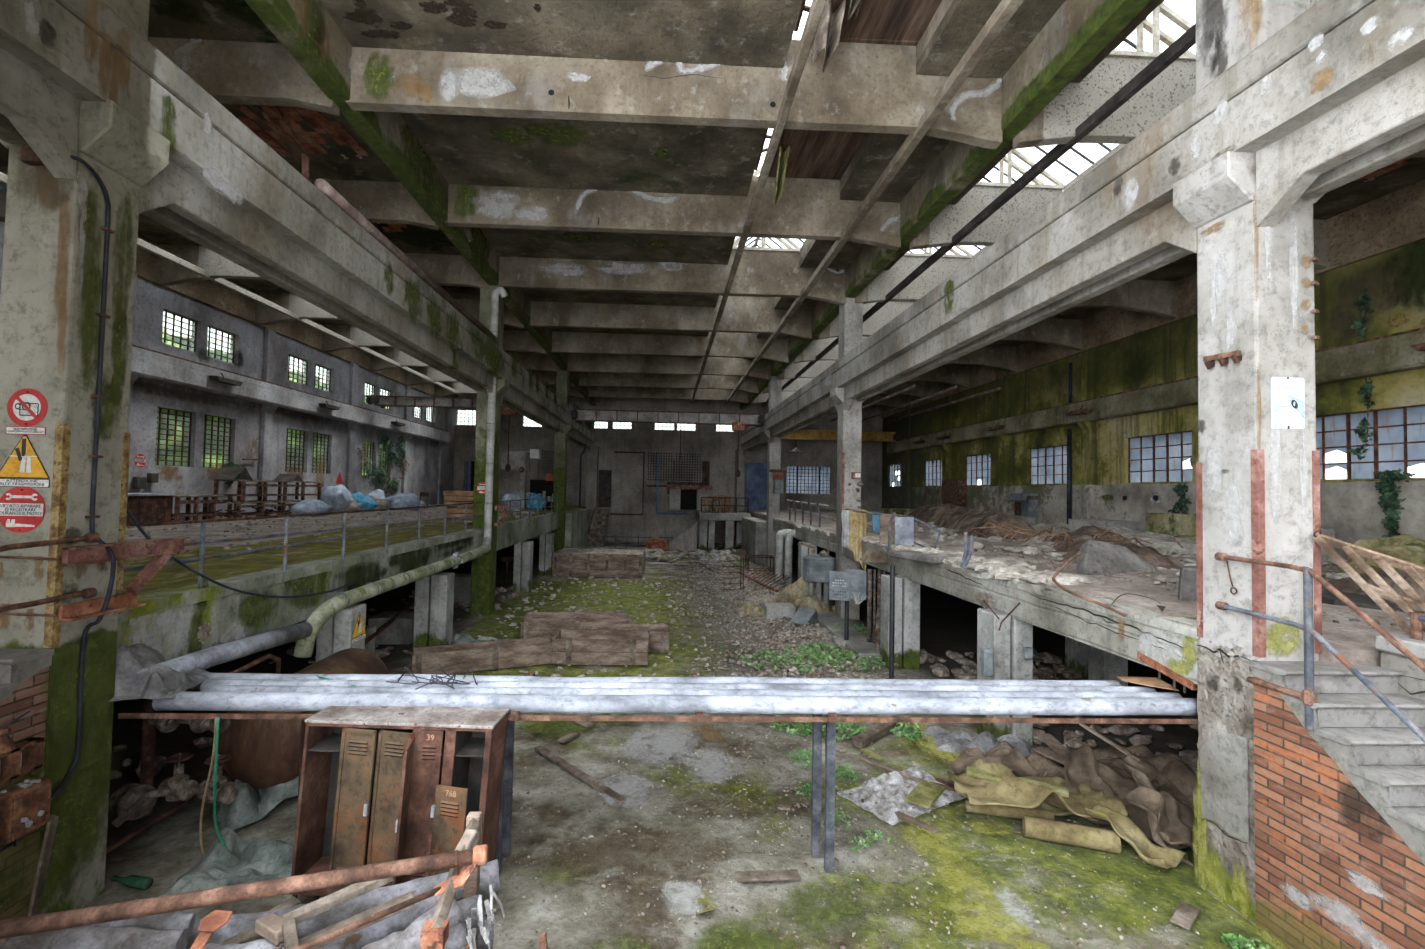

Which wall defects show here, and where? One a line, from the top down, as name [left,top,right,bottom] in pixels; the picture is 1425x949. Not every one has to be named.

water stain [1215,101,1227,122]
water stain [1170,137,1201,175]
water stain [1114,179,1138,208]
water stain [24,166,235,439]
rust [1302,257,1310,332]
water stain [275,407,323,421]